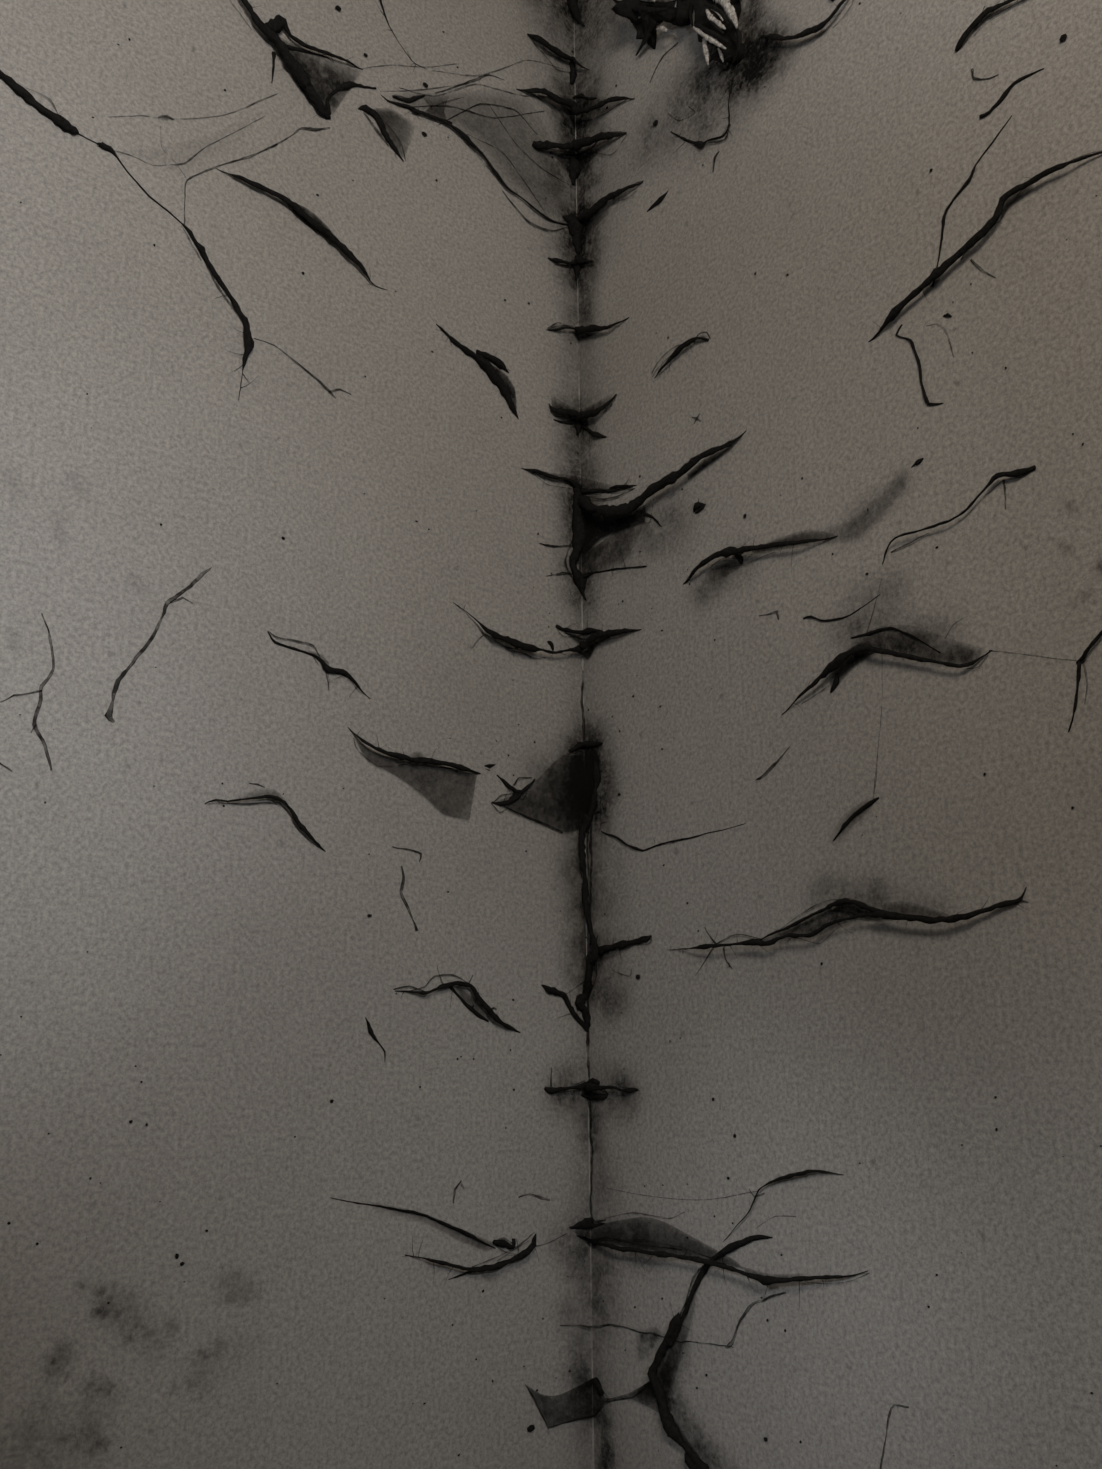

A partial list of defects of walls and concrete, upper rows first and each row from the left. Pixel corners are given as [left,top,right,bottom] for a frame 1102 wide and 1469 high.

crack [0,613,55,771]
crack [104,572,207,721]
crack [579,670,587,739]
crack [587,826,595,946]
crack [586,997,594,1215]
crack [582,1292,786,1348]